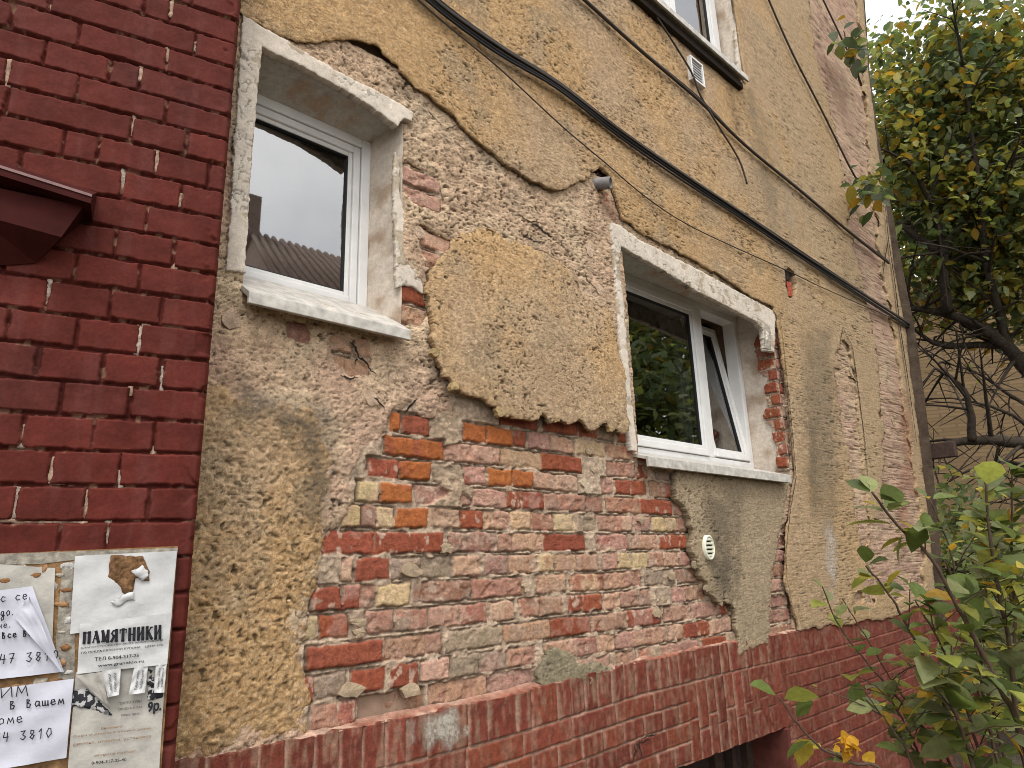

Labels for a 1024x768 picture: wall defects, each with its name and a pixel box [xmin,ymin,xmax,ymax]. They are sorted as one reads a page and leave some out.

peeling [809,0,923,606]
peeling [133,324,149,356]
crack [341,342,417,413]
spalling [175,14,797,762]
peeling [0,486,88,524]